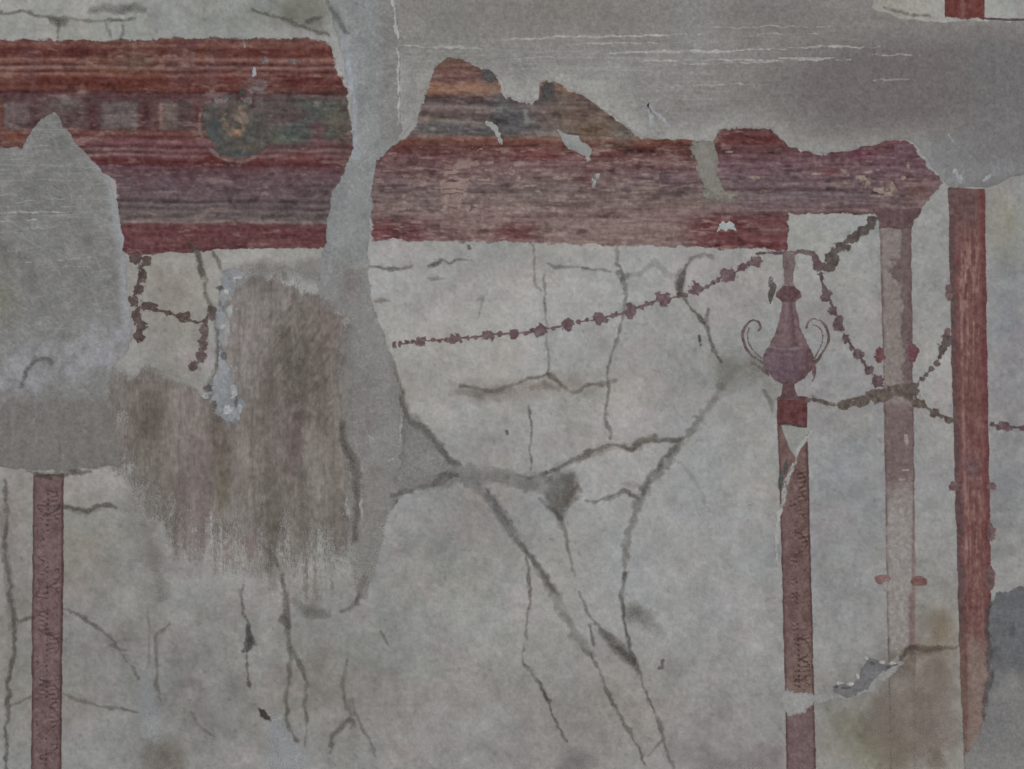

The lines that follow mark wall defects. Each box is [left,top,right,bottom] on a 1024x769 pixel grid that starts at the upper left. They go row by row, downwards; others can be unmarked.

peeling [439,145,541,215]
peeling [485,121,503,145]
peeling [557,129,592,162]
peeling [690,141,737,200]
crack [61,502,116,512]
crack [340,426,358,540]
crack [377,255,722,764]
peeling [774,422,813,573]
crack [3,488,30,769]
crack [241,599,254,686]
crack [280,578,308,742]
spalling [833,658,898,699]